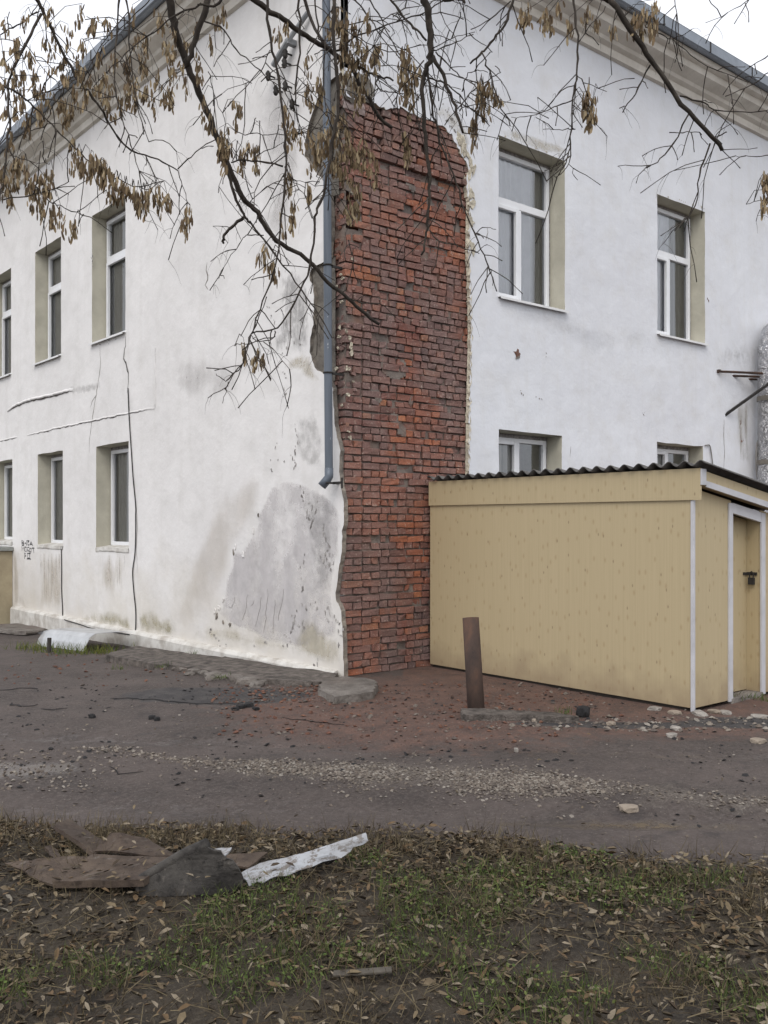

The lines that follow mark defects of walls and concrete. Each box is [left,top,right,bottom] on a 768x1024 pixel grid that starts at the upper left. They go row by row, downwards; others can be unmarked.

crack [89,336,129,442]
flaking render [282,73,476,676]